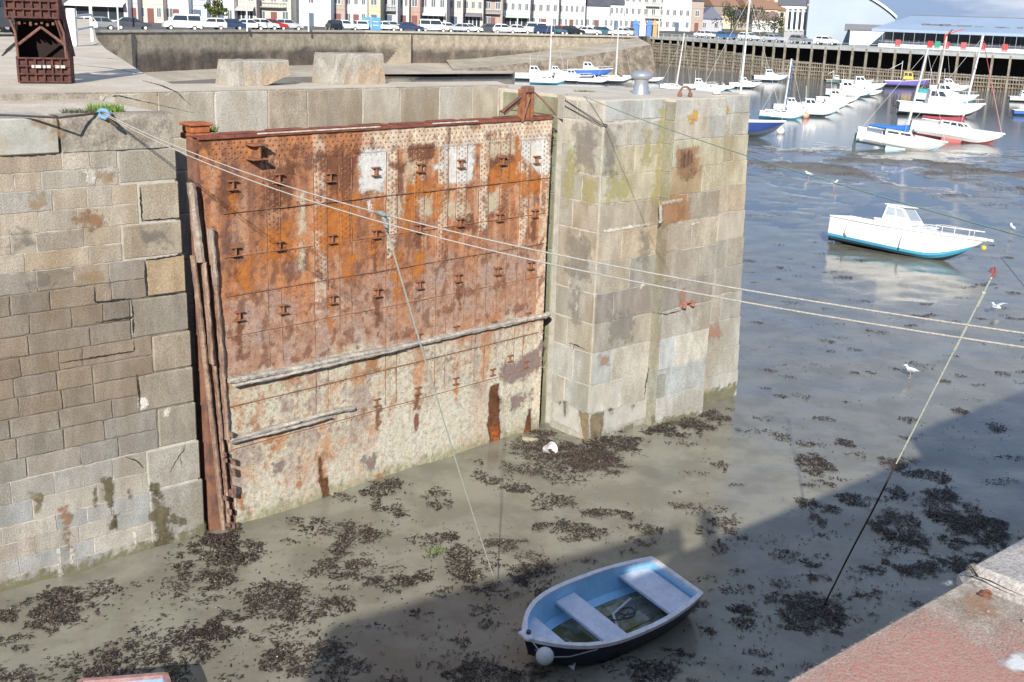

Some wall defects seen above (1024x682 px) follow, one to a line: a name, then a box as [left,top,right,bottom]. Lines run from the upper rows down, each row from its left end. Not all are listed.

corrosion [218,173,239,215]
corrosion [230,220,293,299]
corrosion [261,150,303,210]
corrosion [310,145,386,281]
corrosion [372,142,474,326]
corrosion [486,136,548,197]
corrosion [660,199,691,224]
corrosion [676,146,699,181]
corrosion [235,316,243,353]
corrosion [366,355,381,373]
water stain [93,477,117,530]
water stain [148,483,186,548]